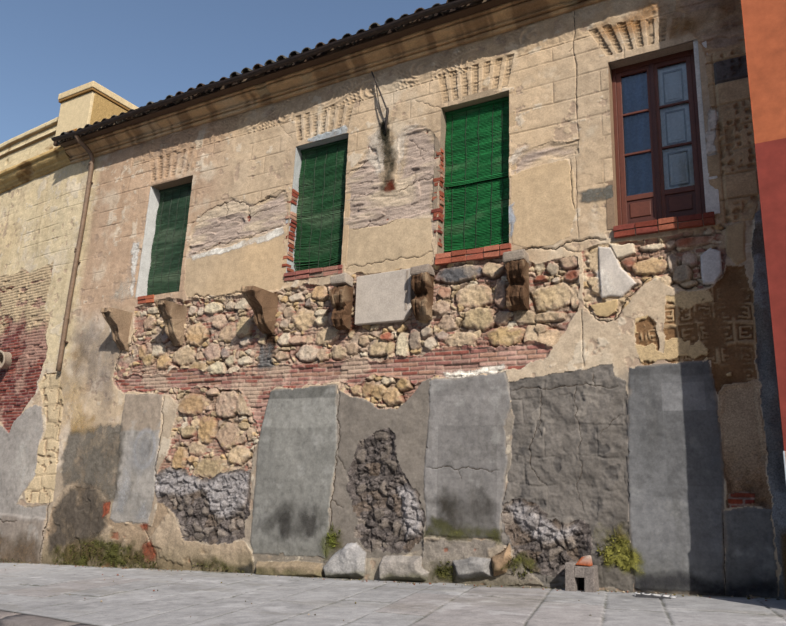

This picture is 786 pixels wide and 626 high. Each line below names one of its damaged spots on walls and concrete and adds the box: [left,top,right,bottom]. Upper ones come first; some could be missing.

spalling [0,125,594,586]
leakage [367,122,416,189]
crack [525,157,600,252]
crack [569,12,579,136]
crack [513,271,670,511]
spalling [582,0,773,509]